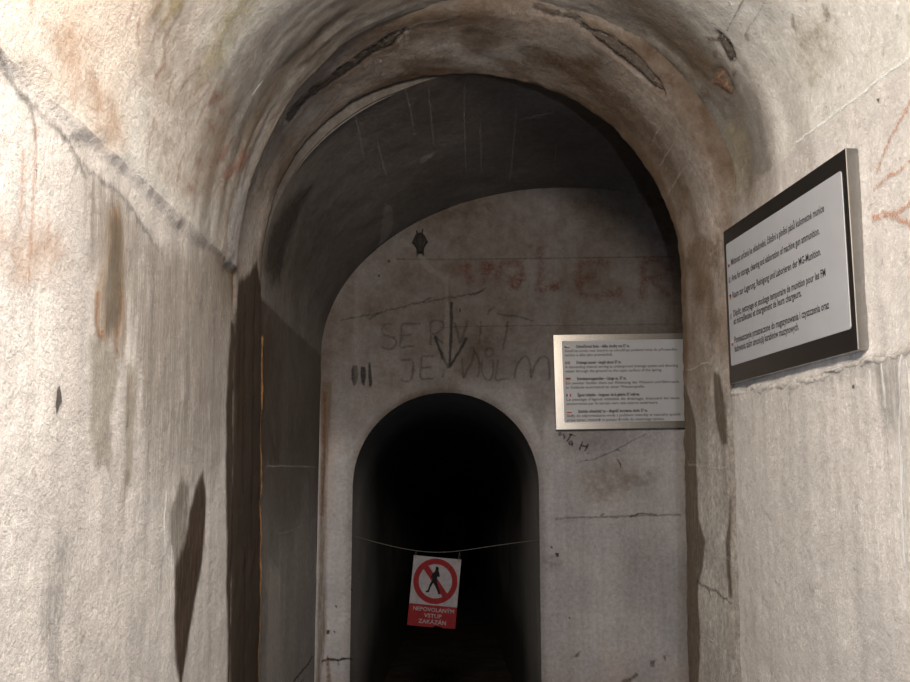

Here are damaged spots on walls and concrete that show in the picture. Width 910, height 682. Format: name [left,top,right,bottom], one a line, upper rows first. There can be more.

spalling [285,28,407,121]